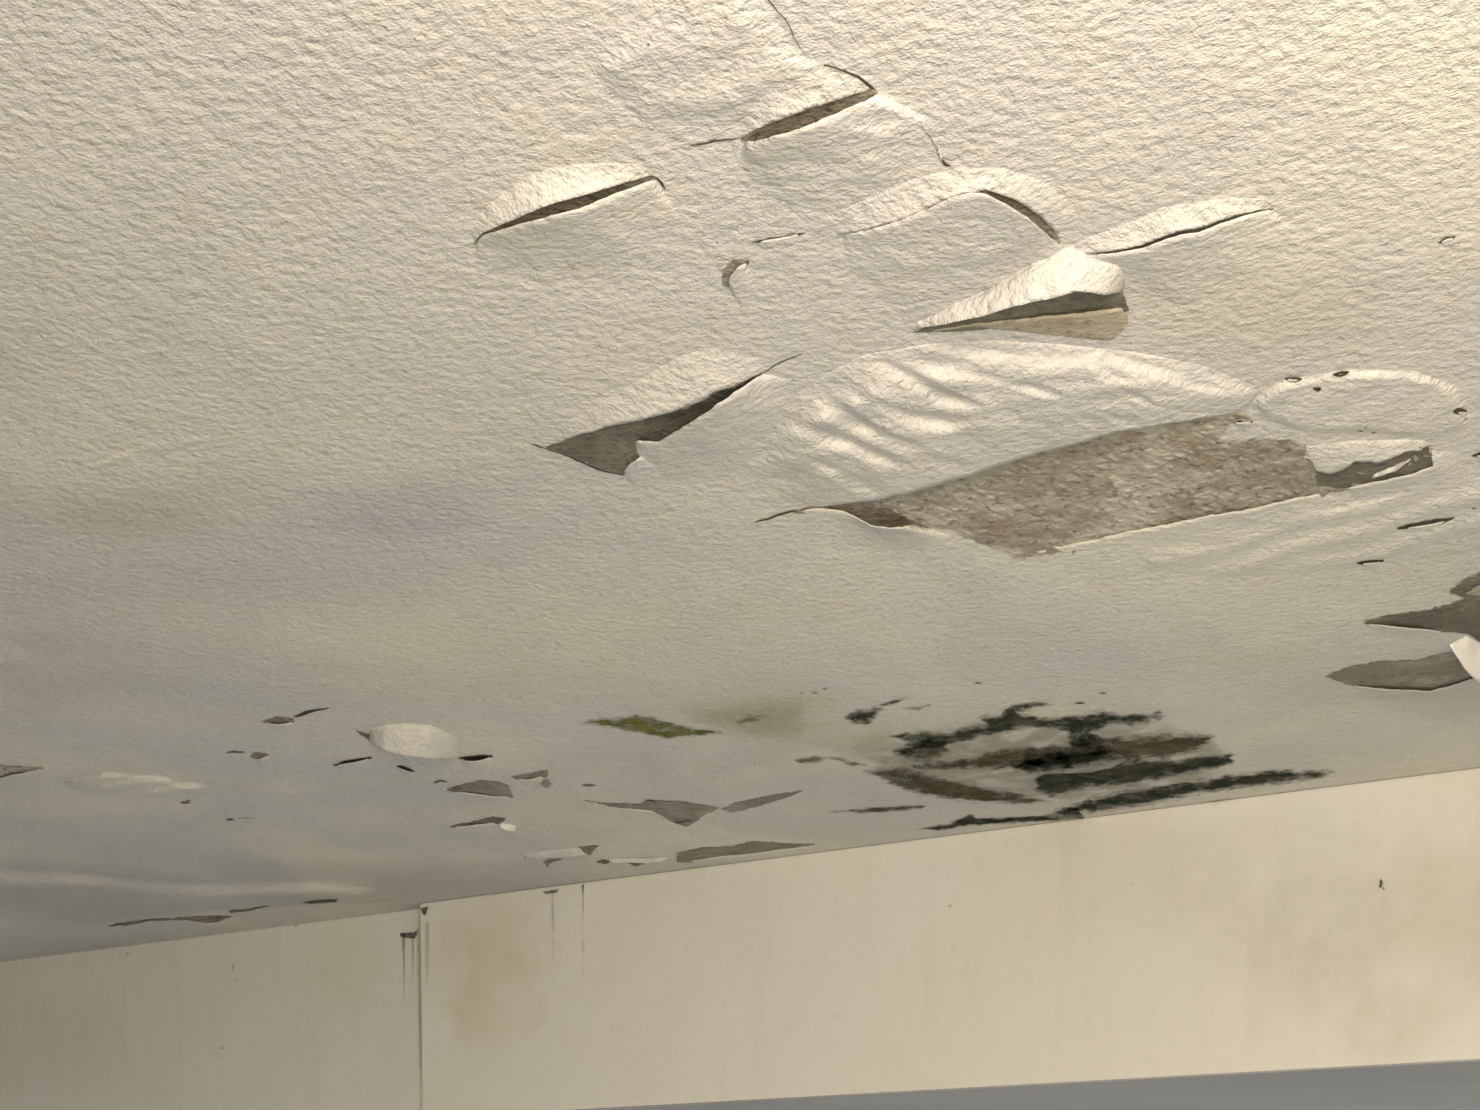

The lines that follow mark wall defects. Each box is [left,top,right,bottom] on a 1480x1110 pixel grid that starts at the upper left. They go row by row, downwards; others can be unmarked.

crack [470,163,680,284]
crack [691,0,1294,321]
peeling [532,247,1473,581]
peeling [1326,573,1480,704]
peeling [0,765,53,793]
peeling [523,791,815,868]
damp [796,700,1323,830]